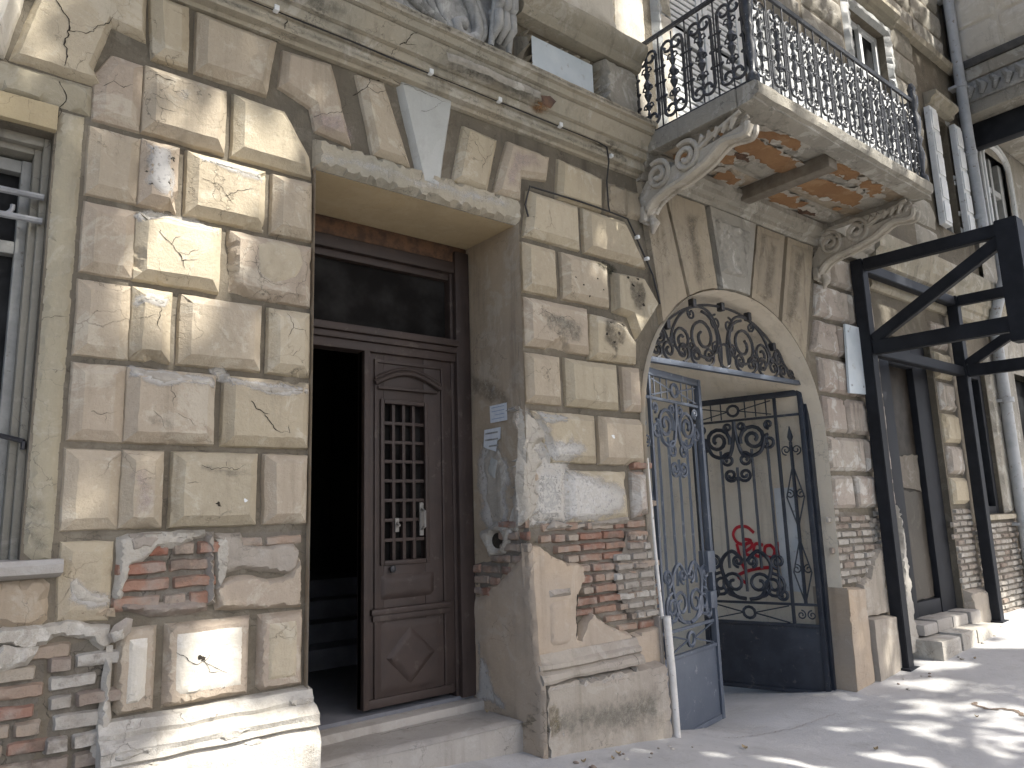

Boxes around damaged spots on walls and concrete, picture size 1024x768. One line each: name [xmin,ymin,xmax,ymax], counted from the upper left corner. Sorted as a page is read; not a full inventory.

crack [56,0,117,116]
peeling [713,125,810,188]
peeling [765,161,886,216]
peeling [473,407,660,631]
flaking render [826,509,884,585]
flaking render [950,509,985,589]
flaking render [991,520,1024,614]
flaking render [0,530,302,768]
peeling [477,648,504,708]